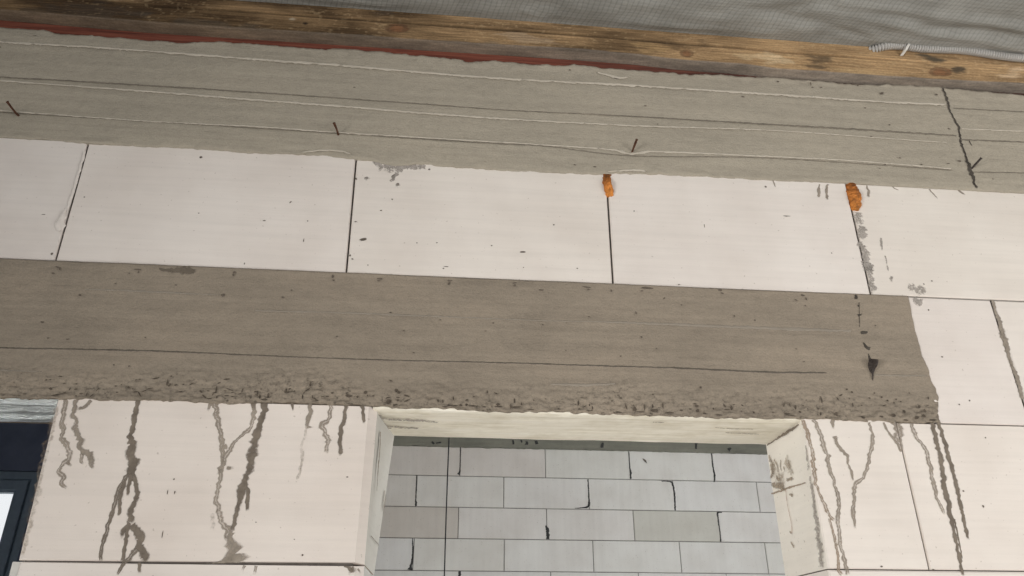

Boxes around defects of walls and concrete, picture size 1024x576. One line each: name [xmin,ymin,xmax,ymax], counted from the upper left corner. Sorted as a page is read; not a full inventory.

crack [942,88,978,188]
crack [854,295,870,358]
water stain [57,399,94,488]
water stain [99,401,149,574]
water stain [208,403,269,572]
water stain [305,403,365,454]
water stain [801,414,969,575]